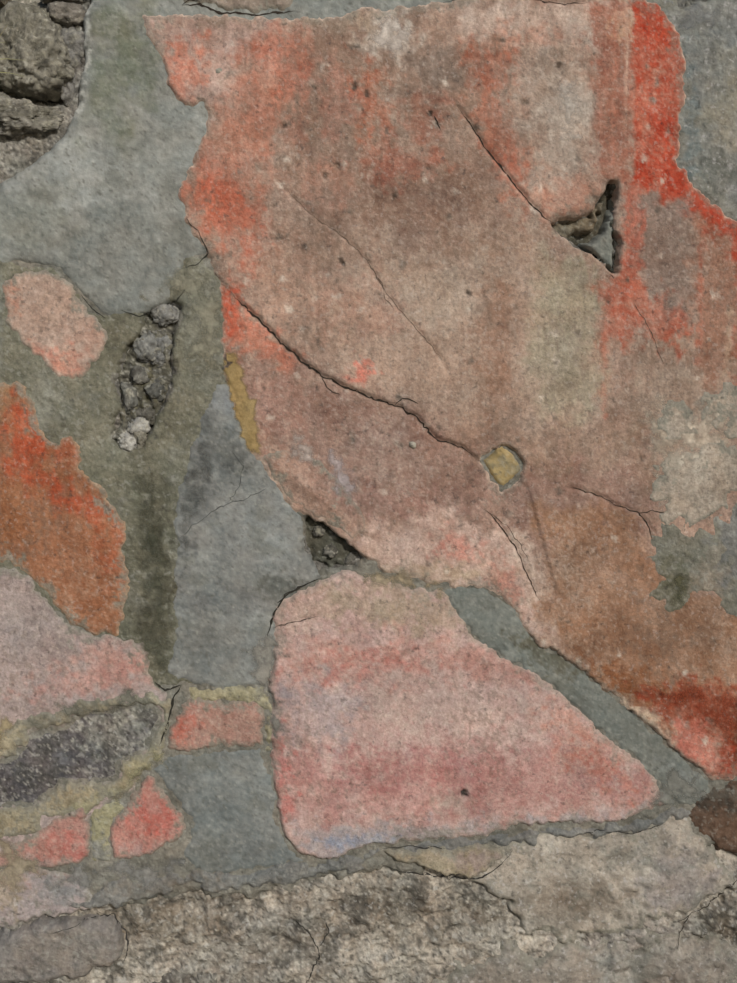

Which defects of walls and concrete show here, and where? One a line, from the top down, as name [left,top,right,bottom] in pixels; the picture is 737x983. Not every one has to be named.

crack [458,107,569,241]
crack [82,219,208,318]
spalling [552,184,615,274]
spalling [110,303,180,452]
crack [222,284,481,462]
spalling [305,516,359,568]
crack [487,511,537,596]
crack [570,487,663,538]
flaking render [384,808,736,944]